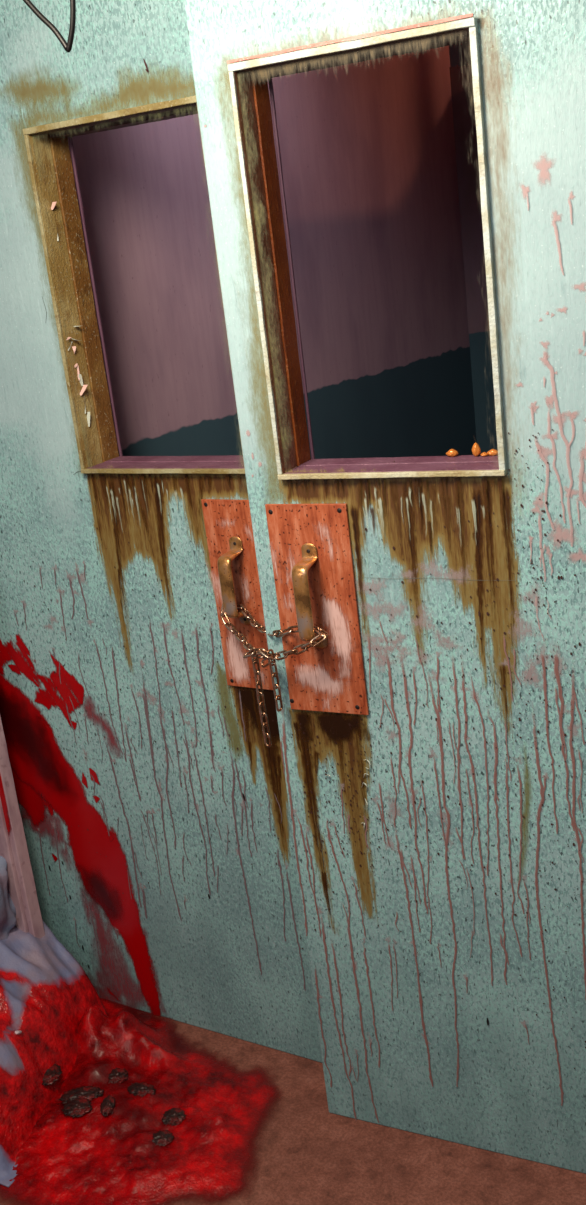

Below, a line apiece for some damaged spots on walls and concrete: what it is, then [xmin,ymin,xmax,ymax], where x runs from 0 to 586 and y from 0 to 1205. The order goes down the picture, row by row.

corrosion [80,473,248,690]
corrosion [199,429,586,954]